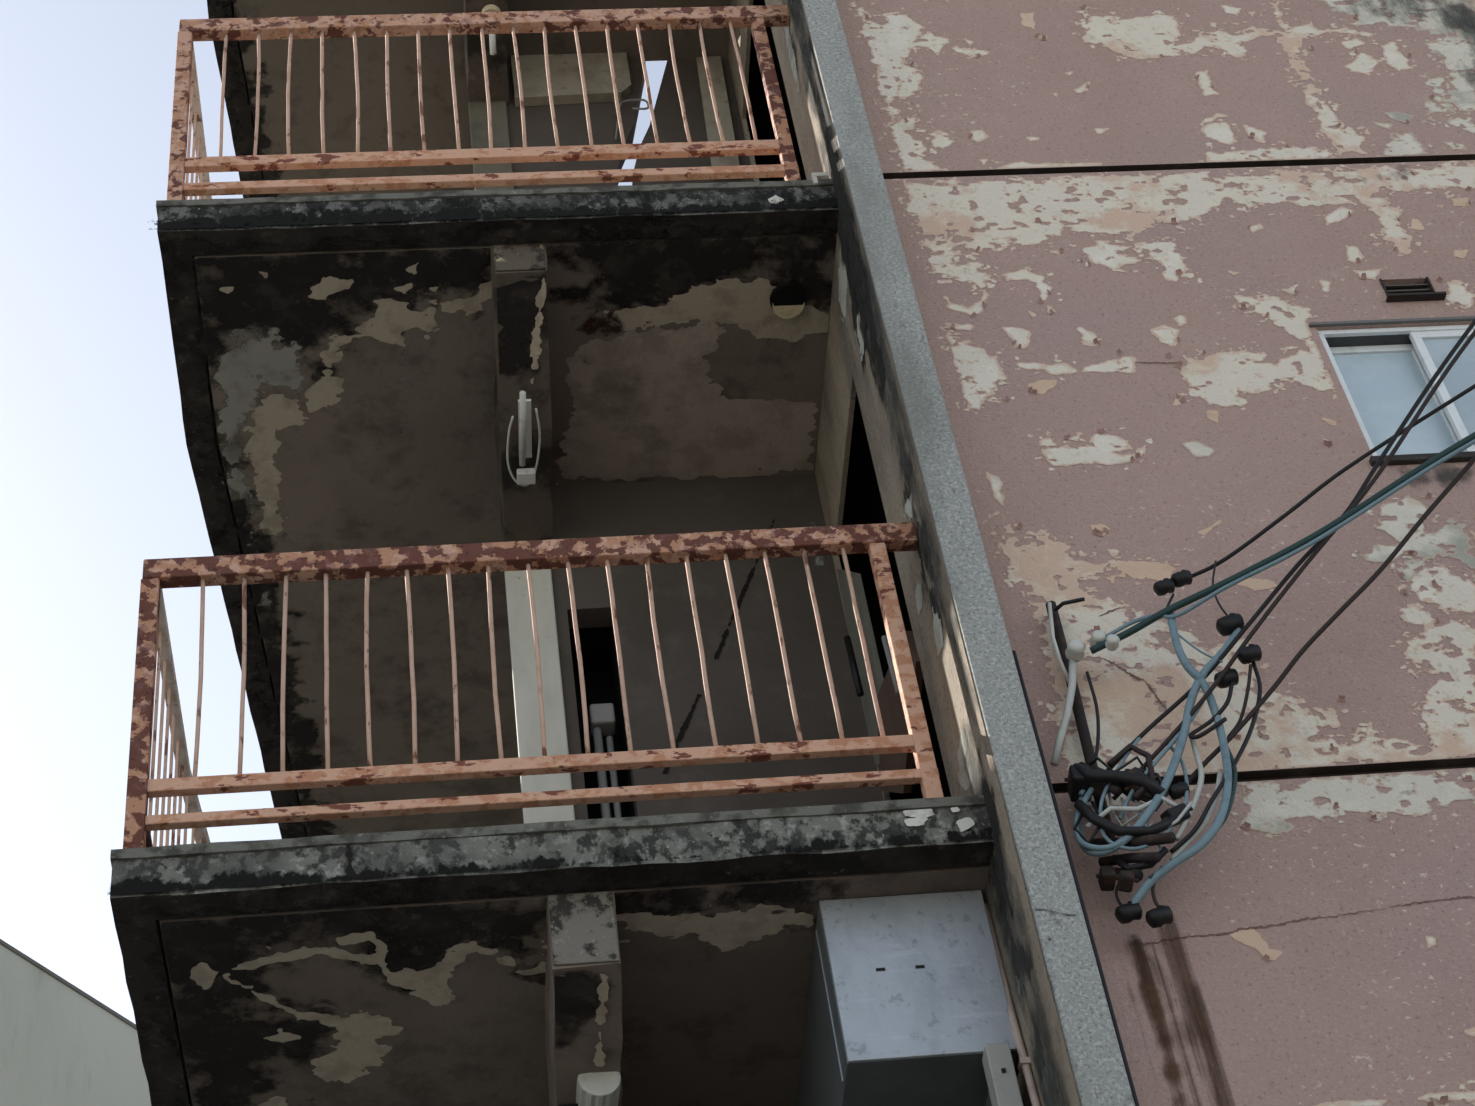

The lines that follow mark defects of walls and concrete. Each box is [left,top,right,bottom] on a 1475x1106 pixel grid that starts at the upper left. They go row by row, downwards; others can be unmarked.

leakage [1391,0,1475,41]
peeling [849,0,1475,422]
peeling [213,263,492,546]
leakage [149,0,972,698]
peeling [555,244,864,485]
leakage [227,583,324,771]
peeling [986,472,1475,841]
leakage [287,788,341,838]
peeling [190,931,547,1083]
leakage [108,853,841,1106]
peeling [616,903,814,952]
leakage [749,728,1069,1106]